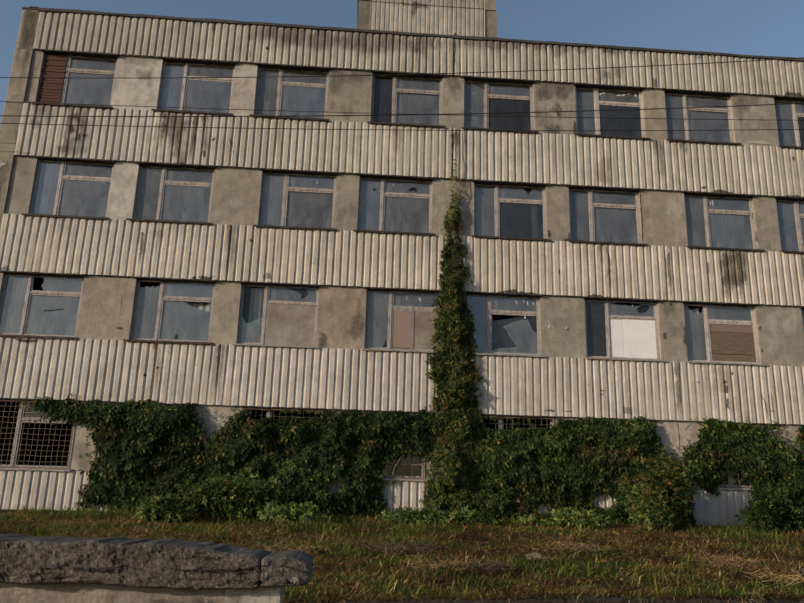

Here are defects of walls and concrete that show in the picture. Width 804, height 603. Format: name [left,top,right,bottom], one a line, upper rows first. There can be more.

damp [160,113,204,147]
damp [721,252,746,285]